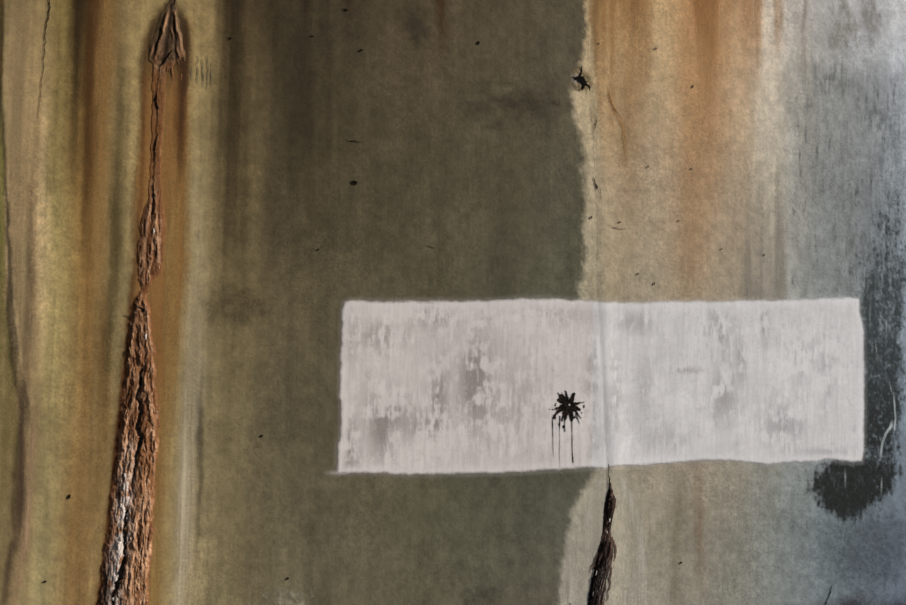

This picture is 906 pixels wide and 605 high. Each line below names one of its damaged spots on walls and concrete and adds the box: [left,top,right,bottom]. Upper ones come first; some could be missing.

rust [591,0,614,78]
rust [691,0,720,98]
leakage [0,0,37,393]
leakage [7,407,39,582]
rust [104,338,129,542]
rust [129,2,189,605]
leakage [811,213,906,588]